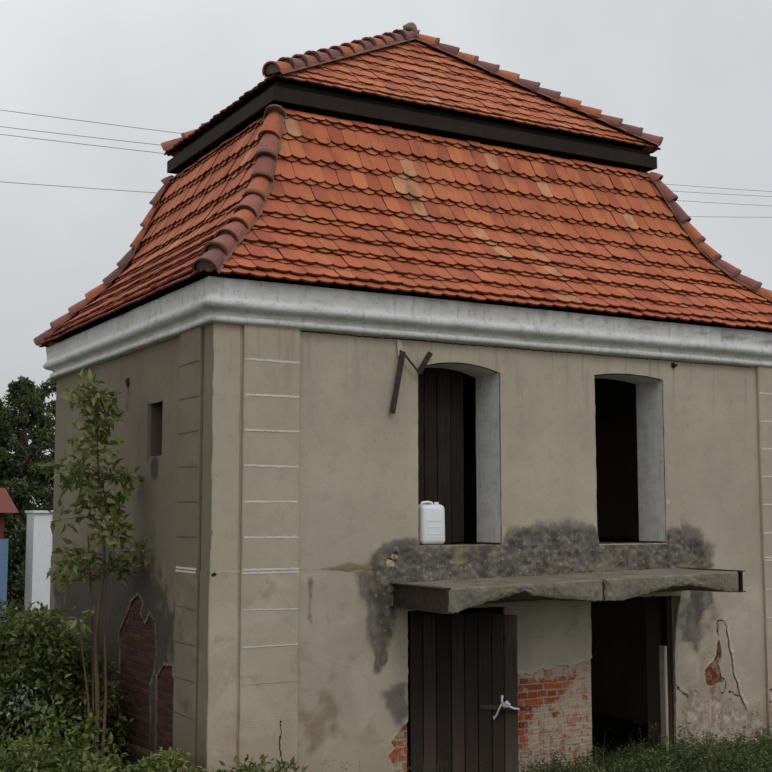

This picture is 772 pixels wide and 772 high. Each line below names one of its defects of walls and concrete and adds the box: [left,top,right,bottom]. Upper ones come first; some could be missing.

leakage [329,523,714,672]
flaking render [117,595,174,752]
flaking render [385,723,407,772]
flaking render [518,656,593,772]
flaking render [679,637,772,757]
crack [716,620,752,711]